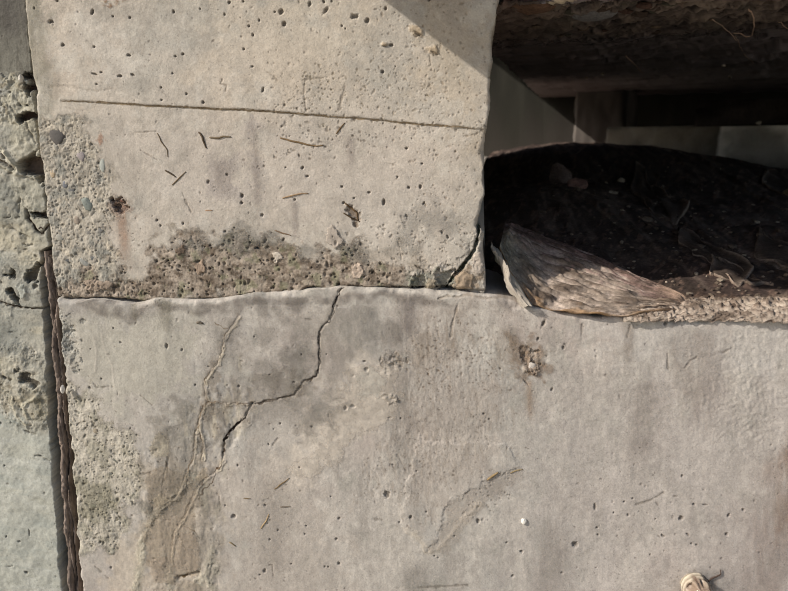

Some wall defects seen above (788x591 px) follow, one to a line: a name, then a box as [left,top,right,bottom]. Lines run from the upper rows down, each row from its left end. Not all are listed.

spalling [18,73,38,92]
spalling [5,111,486,304]
spalling [15,369,41,388]
spalling [59,308,198,581]
crack [162,287,344,557]